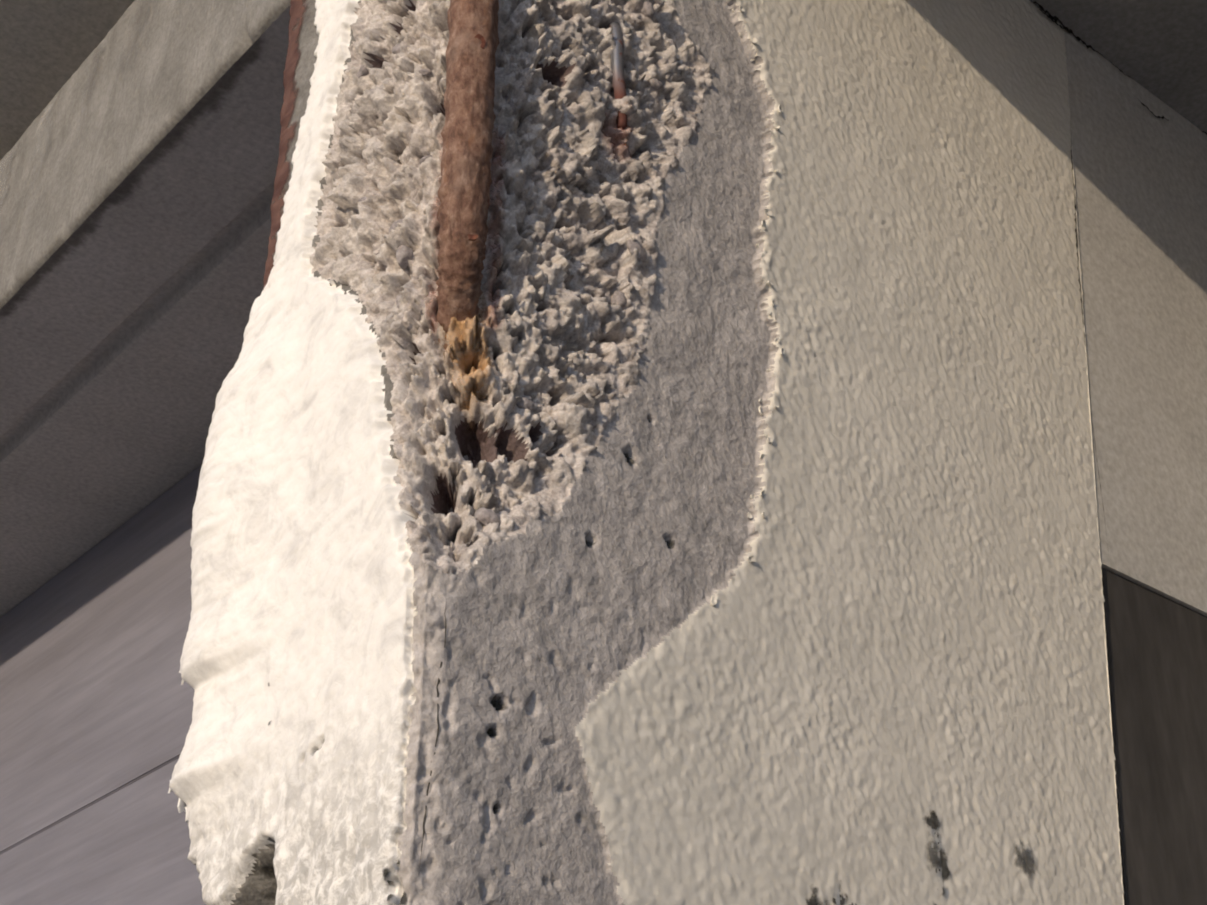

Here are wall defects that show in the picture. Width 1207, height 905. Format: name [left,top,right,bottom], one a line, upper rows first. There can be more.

rust [447,315,490,411]
peeling [309,0,784,905]
water stain [806,888,856,905]
water stain [925,811,950,905]
water stain [1015,842,1035,877]